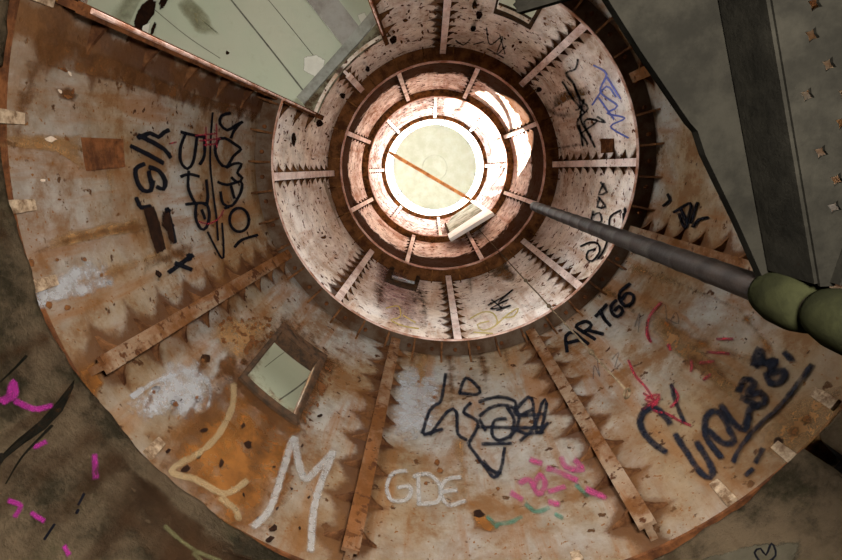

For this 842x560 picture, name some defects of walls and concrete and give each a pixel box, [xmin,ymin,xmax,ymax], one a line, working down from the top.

spalling [134,0,168,35]
peeling [304,55,325,76]
rust [654,315,736,392]
rust [169,331,335,527]